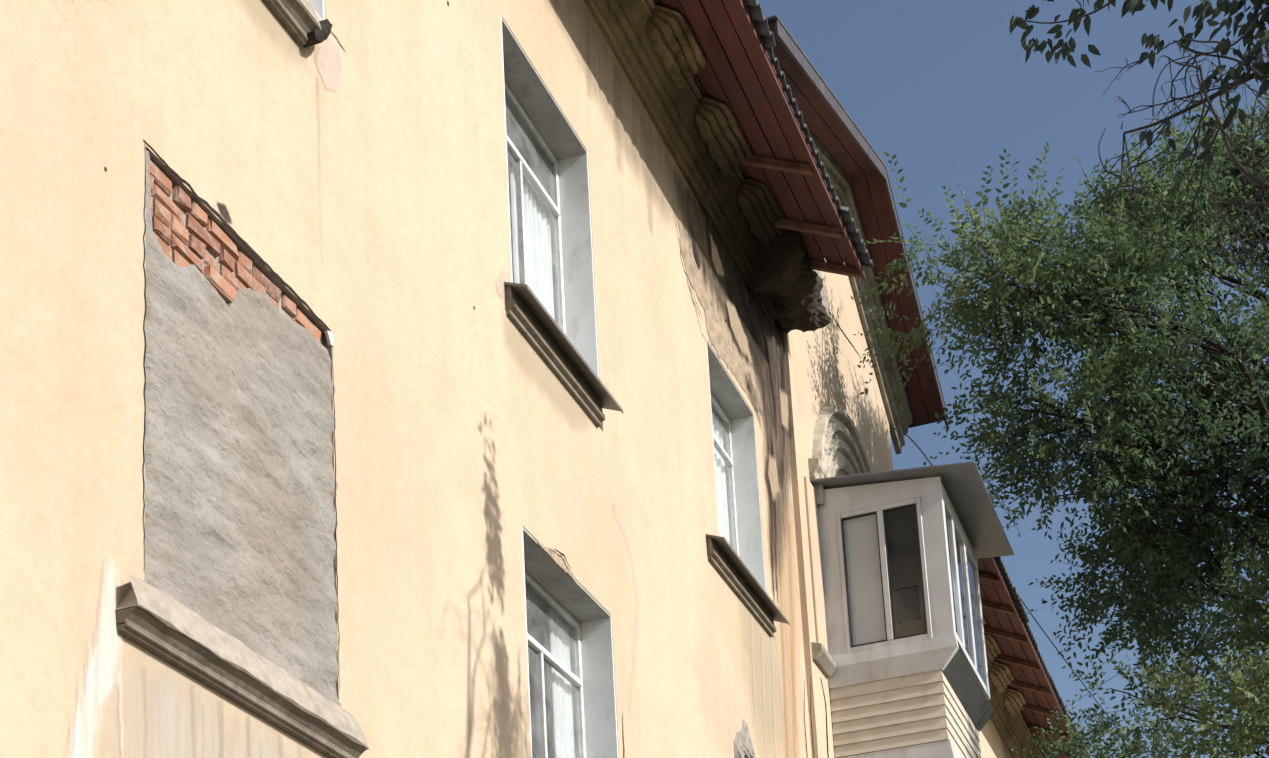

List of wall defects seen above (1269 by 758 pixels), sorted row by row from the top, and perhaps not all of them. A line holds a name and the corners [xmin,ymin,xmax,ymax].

flaking render [149,160,334,347]
leakage [679,180,792,600]
leakage [71,561,121,758]